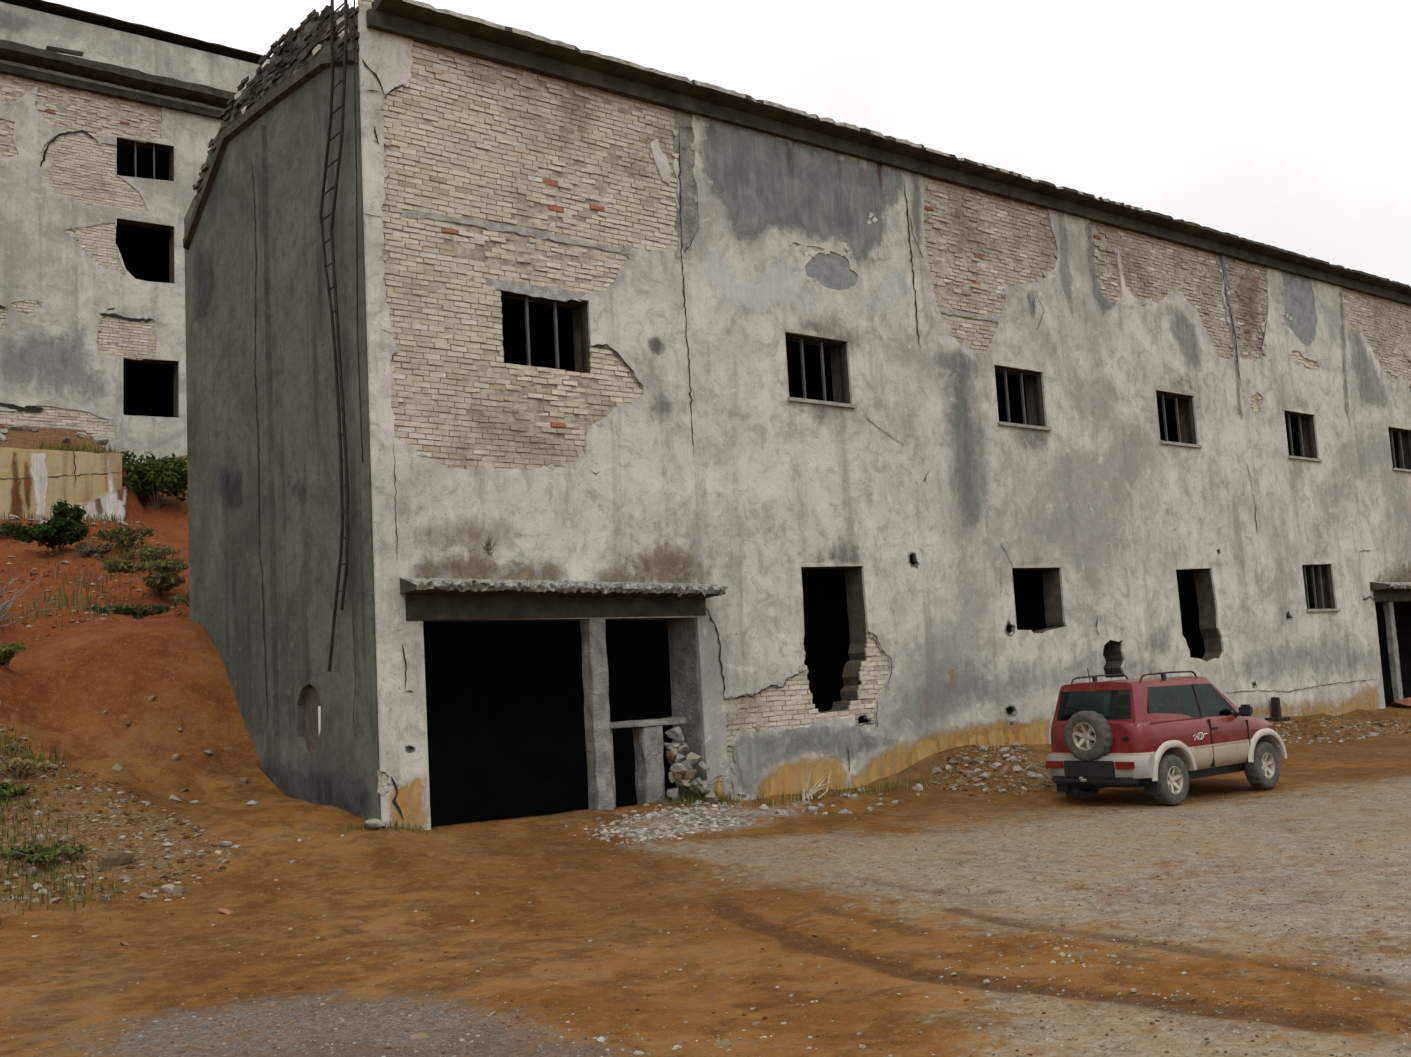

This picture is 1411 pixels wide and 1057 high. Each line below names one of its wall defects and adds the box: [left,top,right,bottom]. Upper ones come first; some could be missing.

flaking render [0,73,162,275]
flaking render [377,41,704,473]
crack [678,124,699,452]
water stain [700,121,920,261]
crack [904,186,923,345]
flaking render [923,177,1061,357]
flaking render [1090,221,1328,371]
flaking render [1342,288,1411,388]
water stain [30,453,48,516]
water stain [68,476,126,521]
flaking render [718,619,895,799]
water stain [734,720,1048,798]